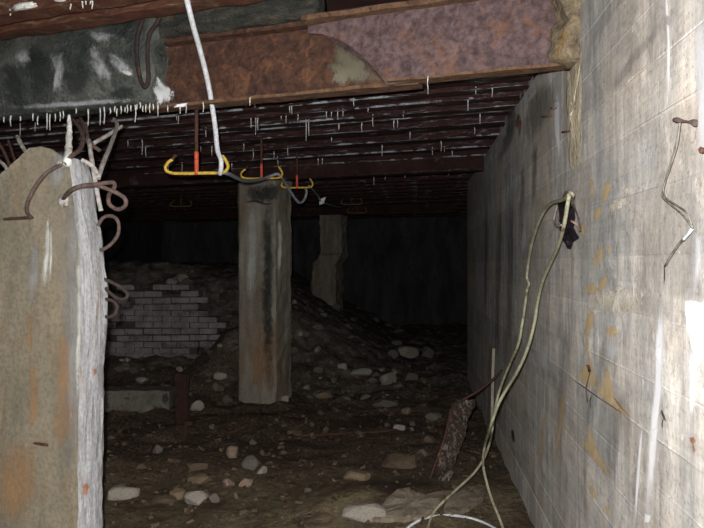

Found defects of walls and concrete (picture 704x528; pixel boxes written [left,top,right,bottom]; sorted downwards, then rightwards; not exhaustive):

water stain [248,213,282,350]